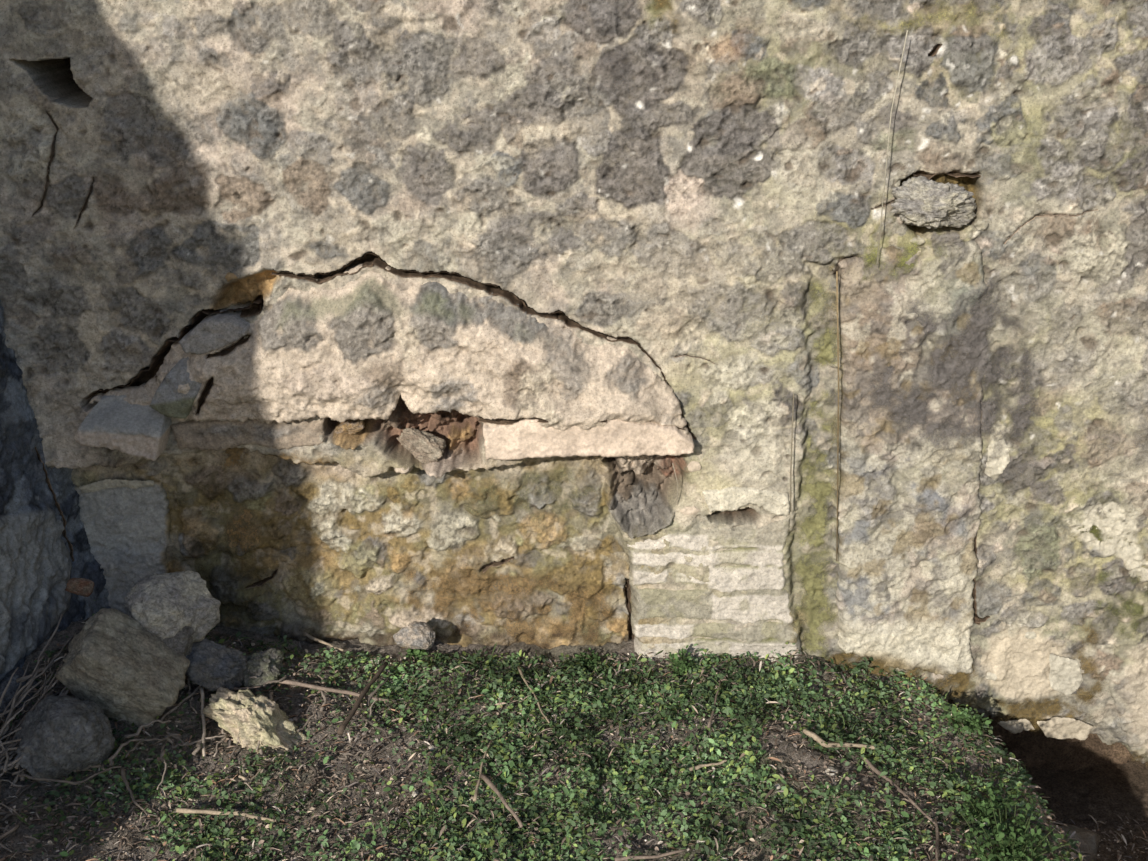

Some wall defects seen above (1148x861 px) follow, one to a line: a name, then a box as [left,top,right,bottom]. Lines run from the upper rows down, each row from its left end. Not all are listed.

crack [32,112,58,216]
crack [74,177,94,228]
spalling [895,169,989,245]
crack [86,251,718,399]
spalling [317,394,485,478]
spalling [599,454,762,539]
peeling [75,479,171,614]
crack [972,535,990,625]